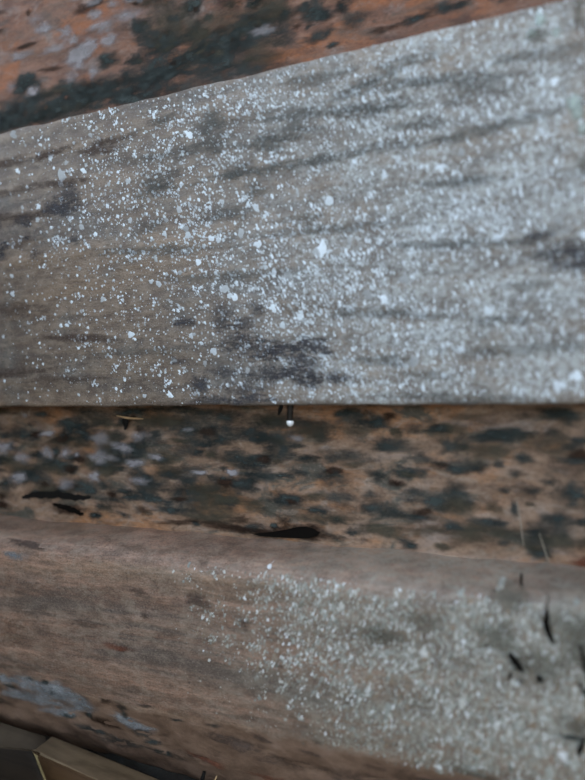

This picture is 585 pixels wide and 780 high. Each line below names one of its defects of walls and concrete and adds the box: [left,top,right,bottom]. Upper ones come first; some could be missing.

mould [374,1,466,32]
mould [0,0,364,132]
leakage [36,146,67,161]
leakage [0,178,84,238]
leakage [523,230,585,270]
leakage [0,304,526,549]
mould [542,408,585,464]
mould [530,480,585,558]
crack [543,593,554,644]
crack [508,653,543,683]
crack [577,644,585,695]
crack [561,735,585,757]